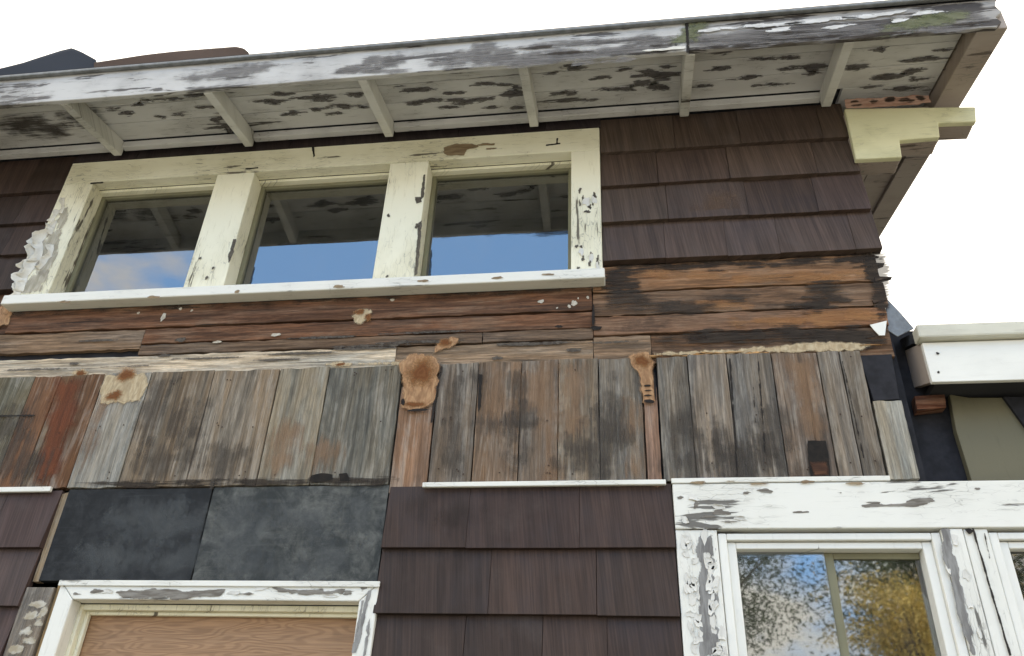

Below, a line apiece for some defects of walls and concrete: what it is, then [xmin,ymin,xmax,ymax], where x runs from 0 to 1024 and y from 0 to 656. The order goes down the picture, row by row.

damp [181,62,277,82]
damp [333,55,413,74]
damp [430,41,592,69]
damp [0,113,84,138]
peeling [11,197,68,295]
damp [594,253,880,315]
damp [656,323,887,351]
peeling [862,497,935,507]
peeling [678,481,746,656]
peeling [941,528,982,655]
peeling [8,601,48,654]
peeling [73,587,371,656]